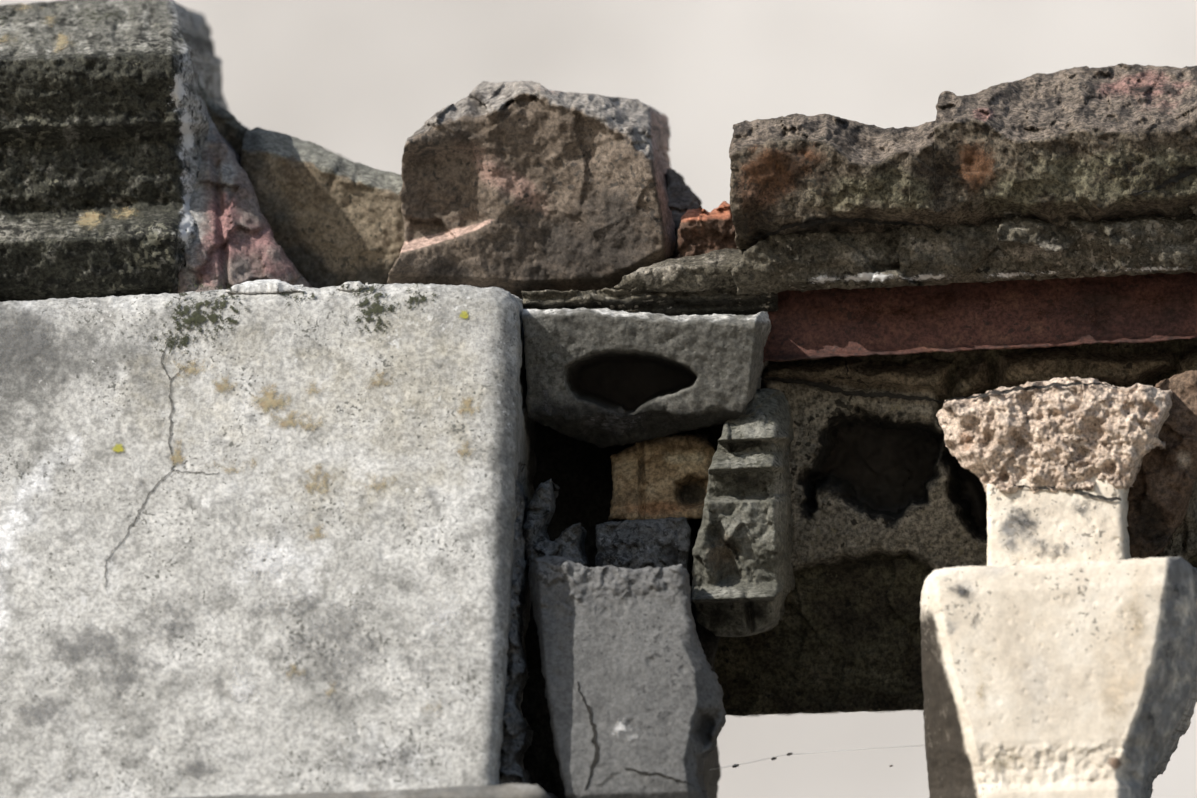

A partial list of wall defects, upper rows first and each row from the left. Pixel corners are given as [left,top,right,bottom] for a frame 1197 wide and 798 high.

crack [104,345,218,589]
crack [1014,485,1121,501]
crack [577,681,693,790]